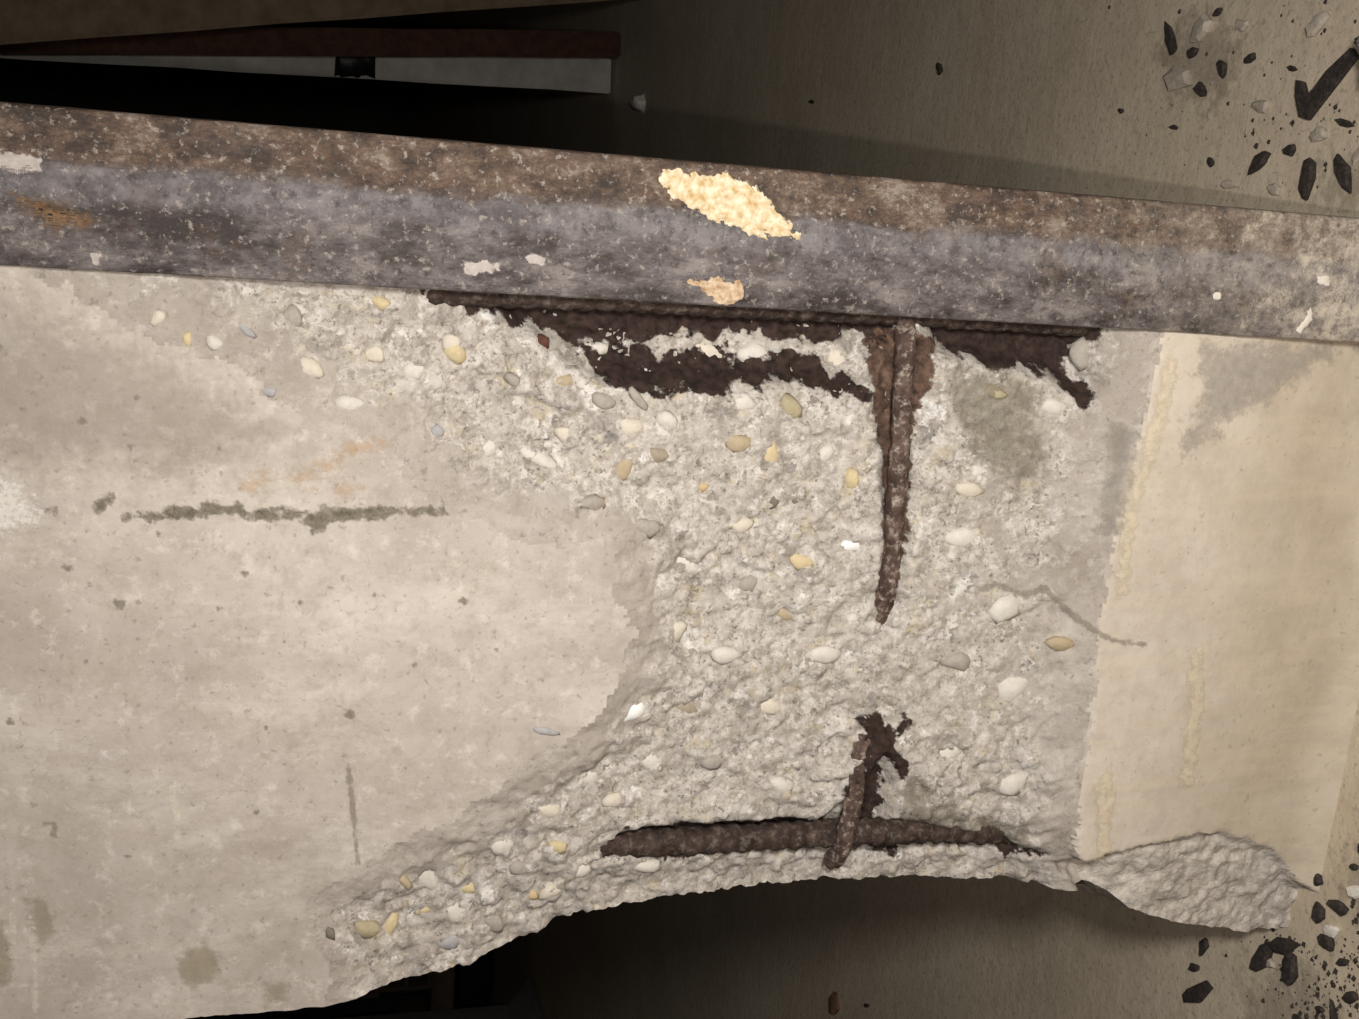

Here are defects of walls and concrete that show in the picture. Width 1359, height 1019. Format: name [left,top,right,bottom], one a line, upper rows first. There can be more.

crack [95,495,444,533]
corrosion [465,306,1101,606]
spalling [24,266,1315,1007]
corrosion [611,711,913,841]
corrosion [872,844,900,858]
corrosion [995,839,1048,859]